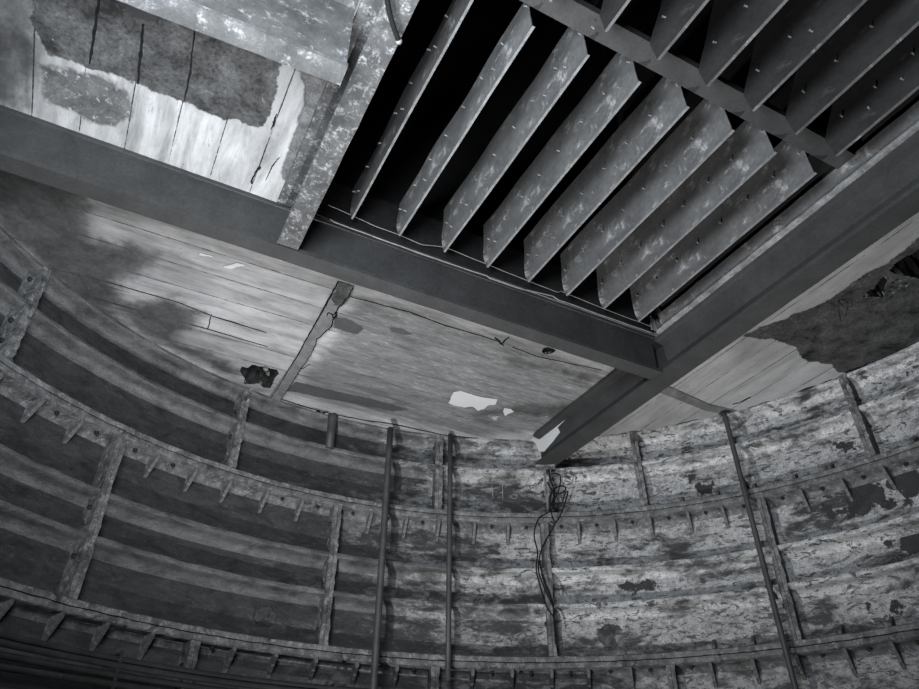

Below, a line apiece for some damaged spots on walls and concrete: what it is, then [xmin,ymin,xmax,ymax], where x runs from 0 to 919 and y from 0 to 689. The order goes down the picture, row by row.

crack [89,0,100,64]
crack [136,23,144,84]
crack [184,31,195,101]
crack [251,158,279,184]
spalling [863,250,919,298]
spalling [240,365,279,388]
peeling [449,391,514,420]